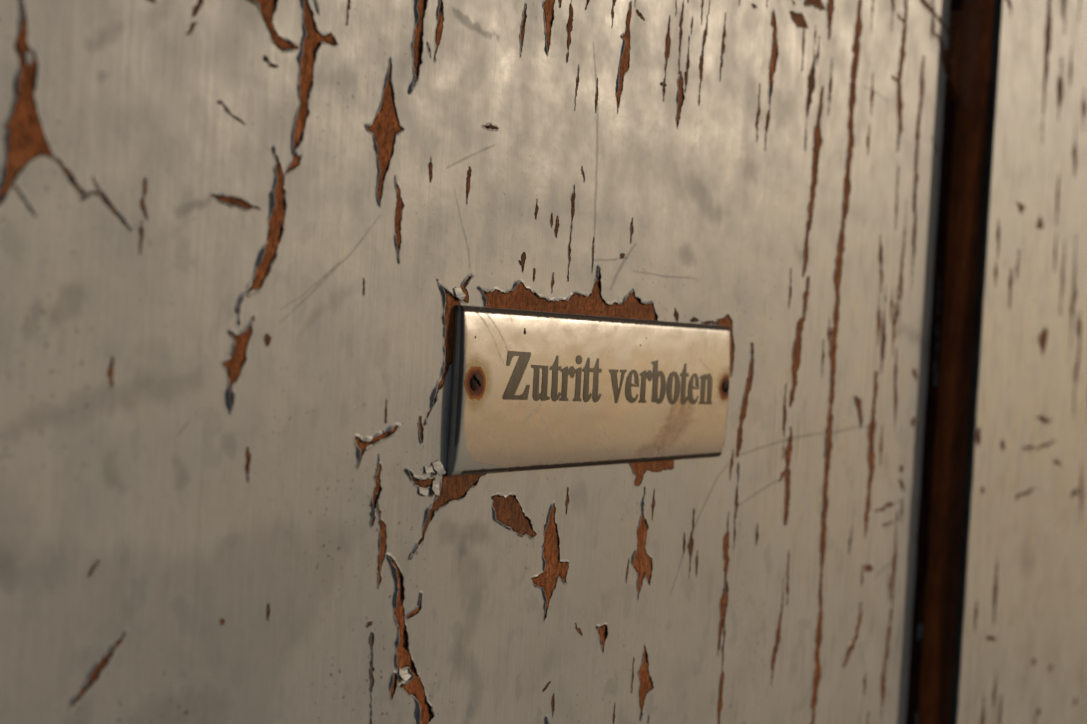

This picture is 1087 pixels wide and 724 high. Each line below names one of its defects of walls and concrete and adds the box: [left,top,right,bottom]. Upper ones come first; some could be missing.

peeling [0,0,133,232]
peeling [210,0,339,417]
peeling [364,56,405,264]
peeling [408,0,445,95]
peeling [542,0,555,57]
peeling [417,264,658,444]
peeling [714,312,735,377]
peeling [353,422,402,471]
peeling [386,460,487,724]
peeling [490,492,569,623]
peeling [628,460,674,601]
peeling [68,628,128,712]